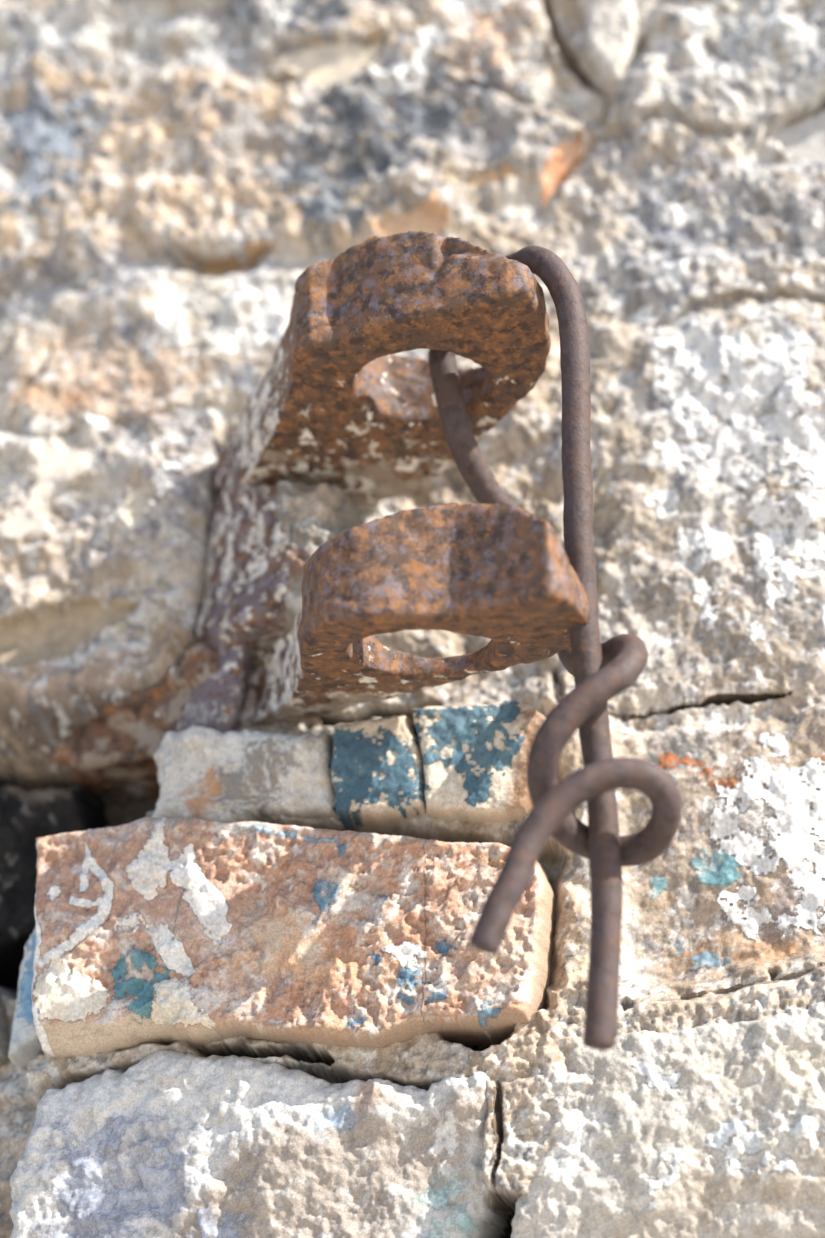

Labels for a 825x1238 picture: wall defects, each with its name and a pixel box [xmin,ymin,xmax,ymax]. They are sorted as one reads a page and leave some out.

crack [542,0,602,95]
crack [446,77,587,129]
peeling [654,198,701,228]
peeling [630,303,825,631]
crack [609,691,792,722]
peeling [238,701,526,857]
rust [658,752,766,789]
peeling [690,733,825,942]
peeling [17,817,232,1057]
peeling [372,940,456,1005]
crack [657,963,825,1001]
rust [718,933,800,966]